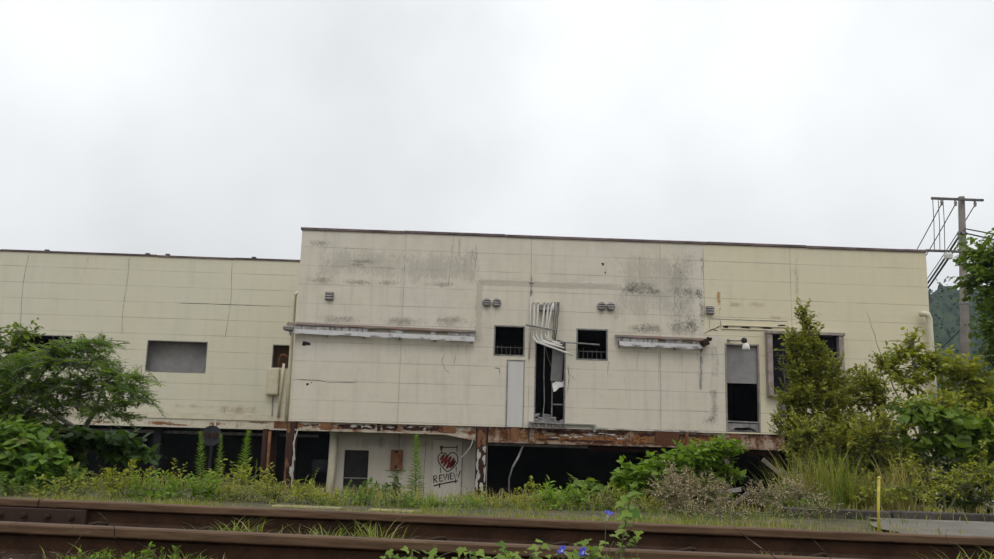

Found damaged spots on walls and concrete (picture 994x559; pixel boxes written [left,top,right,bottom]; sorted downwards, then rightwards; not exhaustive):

rust [287,423,443,433]
rust [508,430,655,444]
rust [679,433,727,444]